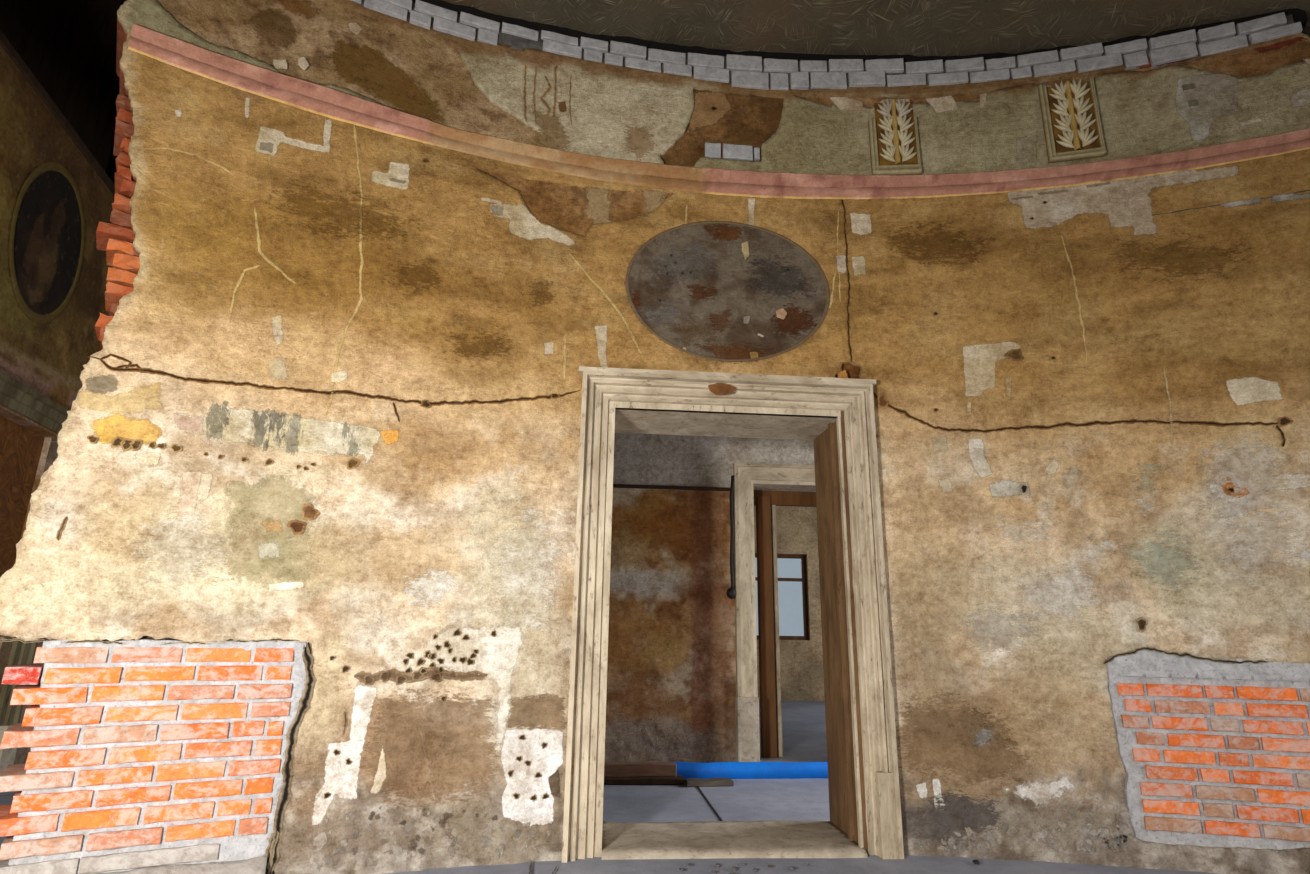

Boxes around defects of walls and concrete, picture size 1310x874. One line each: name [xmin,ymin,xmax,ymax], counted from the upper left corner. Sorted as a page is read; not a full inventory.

flaking render [661,89,784,166]
flaking render [95,94,140,351]
crack [841,199,852,362]
crack [88,354,581,422]
crack [873,391,1293,447]
spalling [329,628,488,702]
flaking render [507,735,560,801]